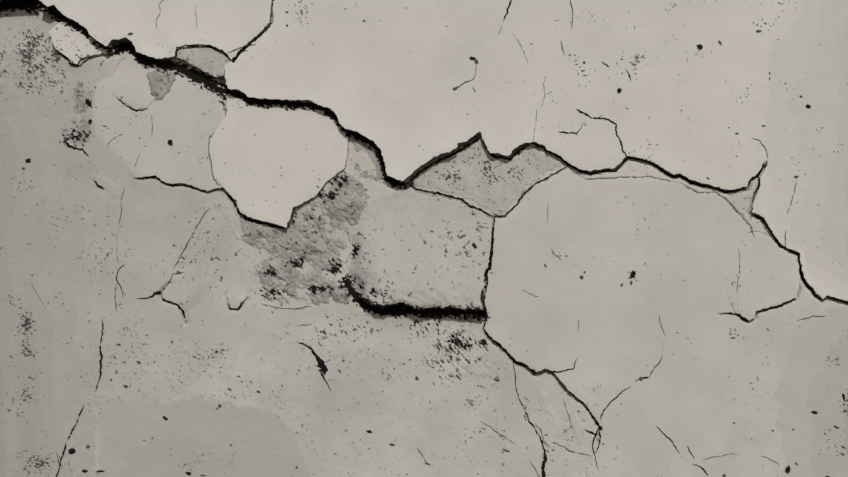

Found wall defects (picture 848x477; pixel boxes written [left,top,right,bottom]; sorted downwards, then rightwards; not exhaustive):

spalling [0,29,59,86]
crack [56,133,288,477]
peeling [156,259,217,321]
peeling [39,0,848,308]
crack [231,90,768,477]
peeling [411,138,800,477]